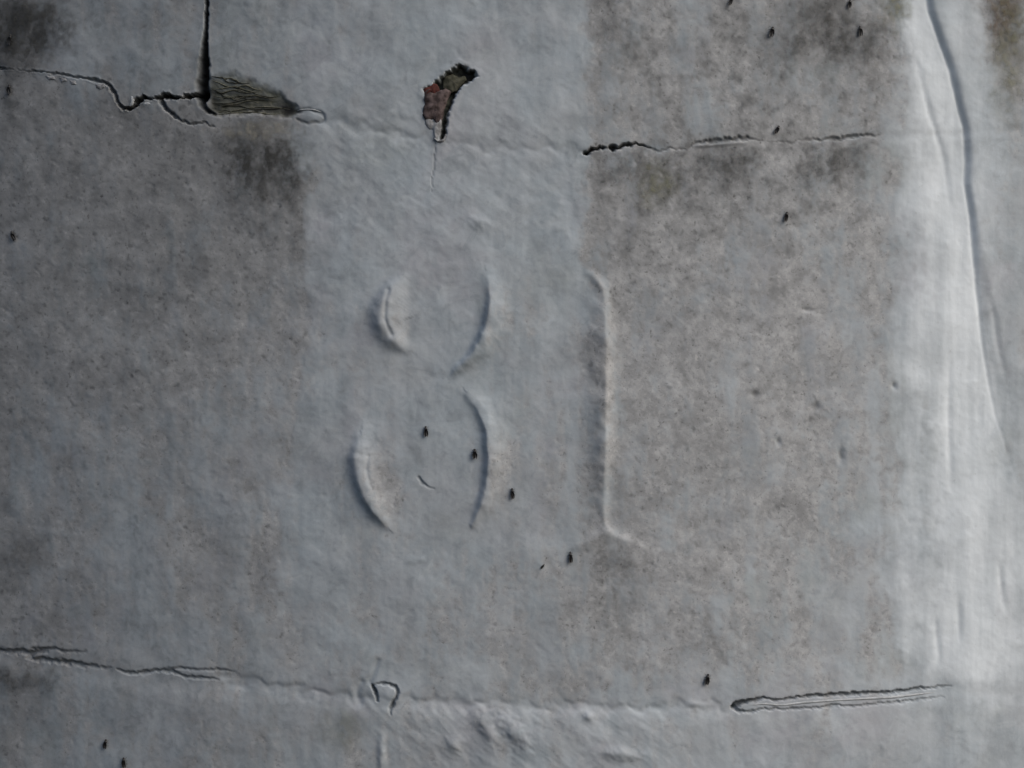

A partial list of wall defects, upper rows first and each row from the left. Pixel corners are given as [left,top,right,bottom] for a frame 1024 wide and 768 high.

crack [0,0,215,129]
spalling [206,69,327,125]
spalling [422,62,480,142]
crack [582,132,881,157]
crack [0,646,236,680]
crack [370,681,400,717]
crack [729,685,952,715]